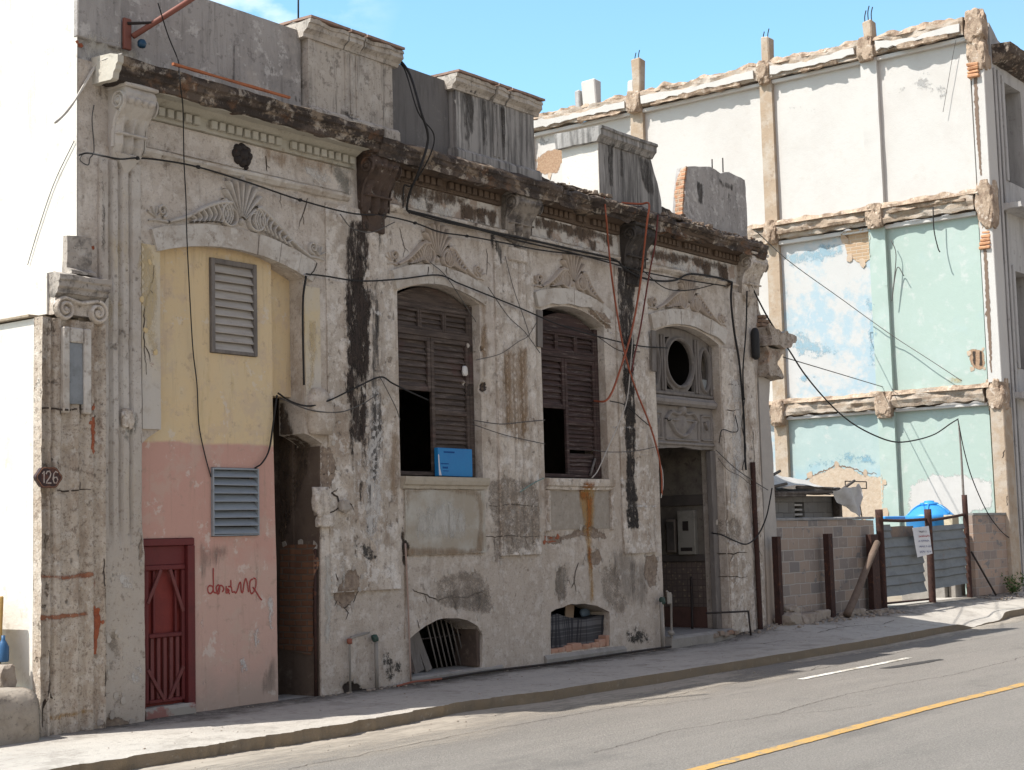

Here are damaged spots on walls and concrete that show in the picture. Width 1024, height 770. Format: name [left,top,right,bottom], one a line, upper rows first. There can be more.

leakage [463,92,505,144]
leakage [639,157,654,194]
leakage [392,178,502,262]
leakage [536,218,613,251]
peeling [787,235,866,268]
leakage [344,221,395,501]
leakage [610,267,656,528]
flaking render [806,455,889,520]
flaking render [486,470,629,617]
corrosion [580,483,594,598]
flaking render [334,566,364,612]
flaking render [434,566,496,621]